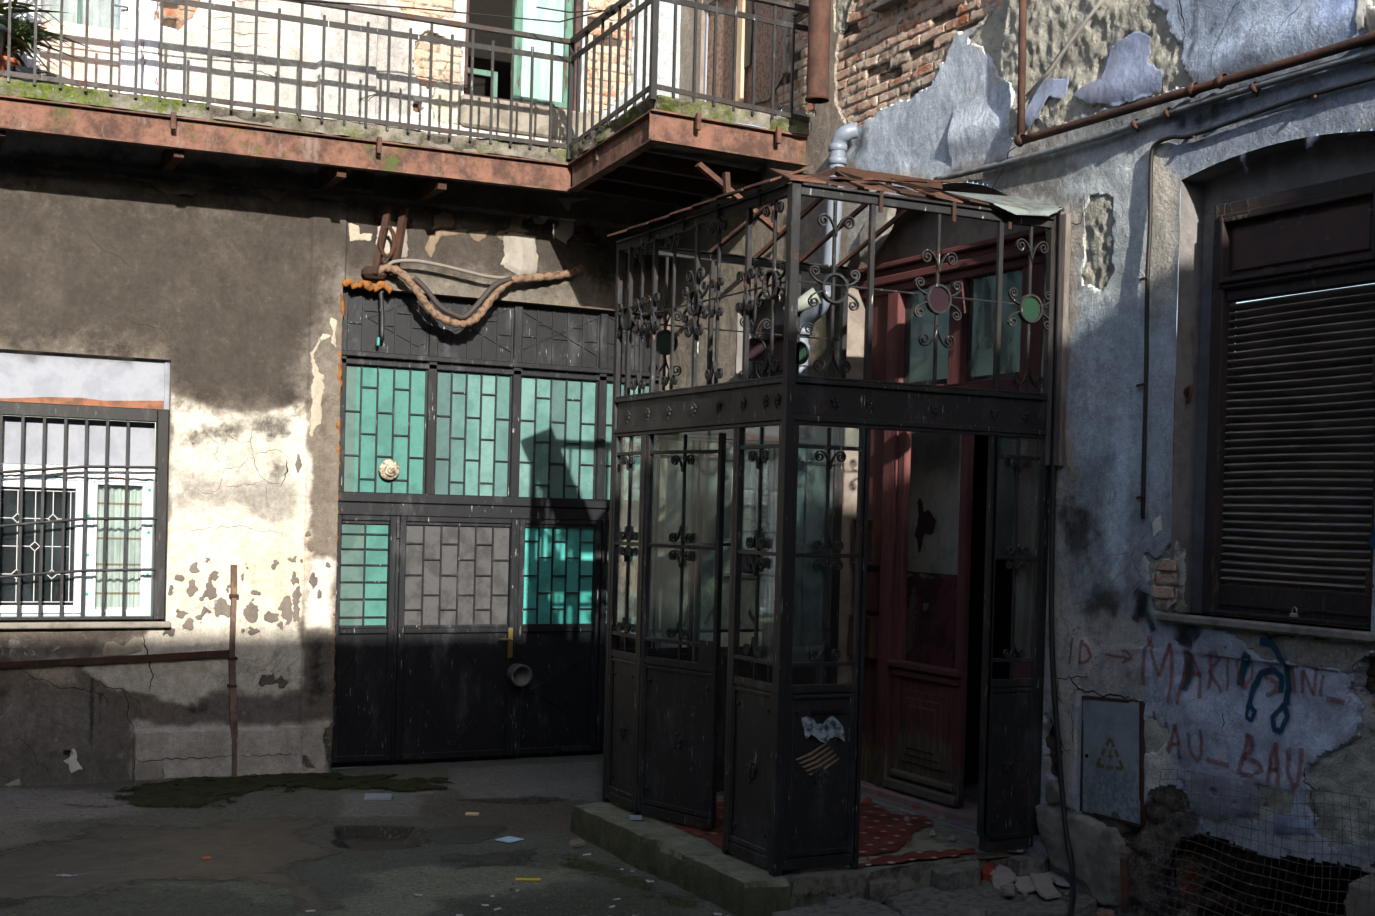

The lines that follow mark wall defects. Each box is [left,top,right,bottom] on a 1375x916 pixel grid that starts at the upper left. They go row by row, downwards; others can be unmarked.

flaking render [163,0,199,29]
flaking render [394,0,462,125]
flaking render [835,0,1191,139]
flaking render [1082,195,1114,290]
peeling [163,531,331,637]
flaking render [1147,541,1187,613]
rust [0,565,239,776]
crack [20,634,297,777]
peeling [259,669,288,688]
flaking render [1144,718,1169,753]
flaking render [1305,658,1375,849]